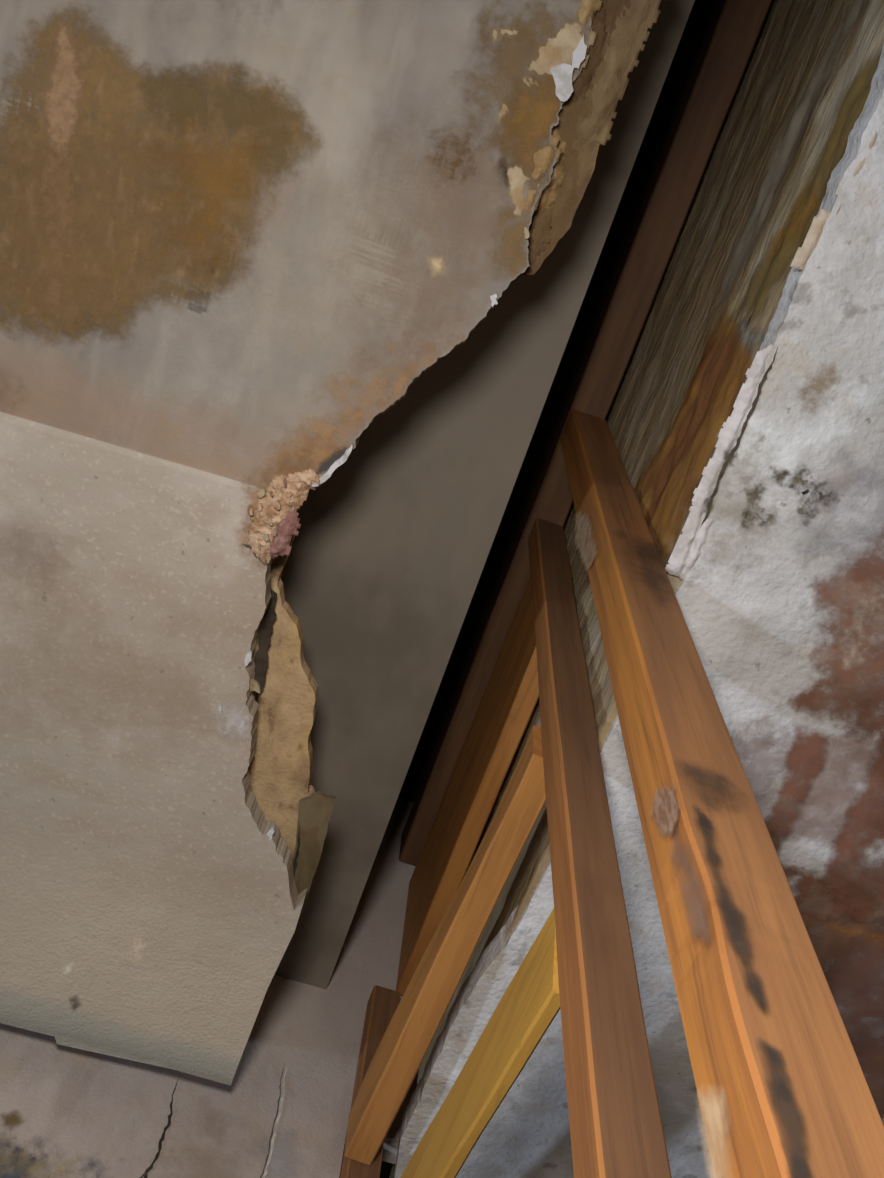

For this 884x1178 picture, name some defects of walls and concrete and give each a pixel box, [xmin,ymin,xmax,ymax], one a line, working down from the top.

leakage [0,10,316,337]
spalling [474,0,661,276]
leakage [634,51,882,556]
leakage [721,0,864,296]
flaking render [218,443,354,906]
crack [139,1073,180,1178]
crack [260,1064,292,1178]